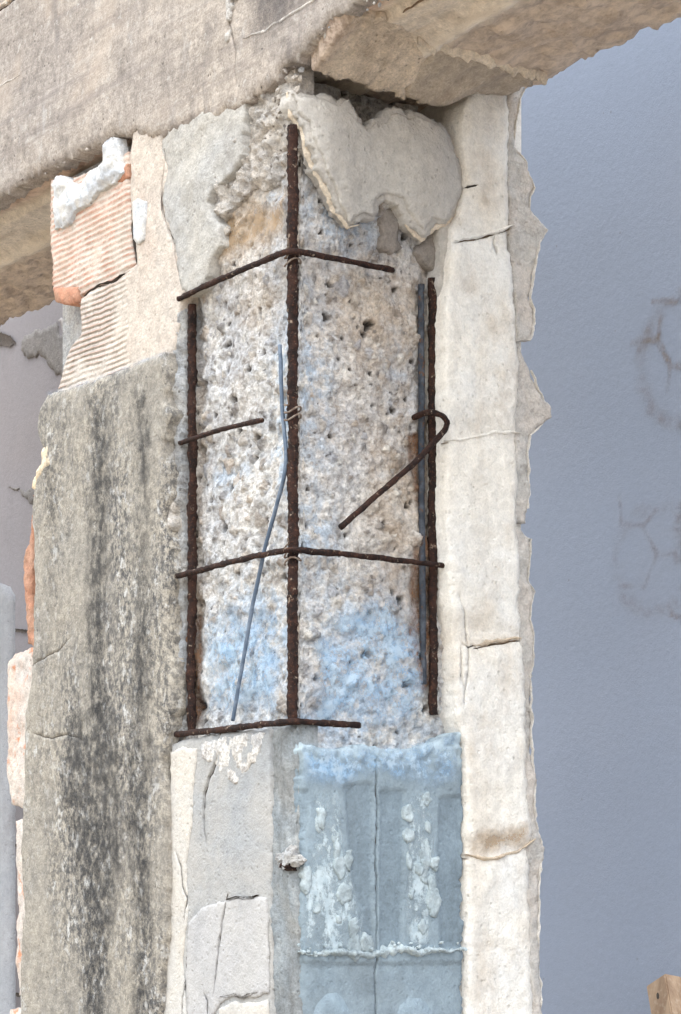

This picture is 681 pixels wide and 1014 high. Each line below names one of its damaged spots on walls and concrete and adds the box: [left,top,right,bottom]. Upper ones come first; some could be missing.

crack [0,0,15,11]
spalling [118,164,132,182]
spalling [53,287,84,307]
spalling [21,318,63,377]
spalling [8,447,50,505]
water stain [139,434,148,496]
corrosion [408,433,419,492]
spalling [164,66,463,1014]
corrosion [409,536,430,689]
water stain [133,603,149,722]
corrosion [185,617,205,721]
water stain [64,415,146,1014]